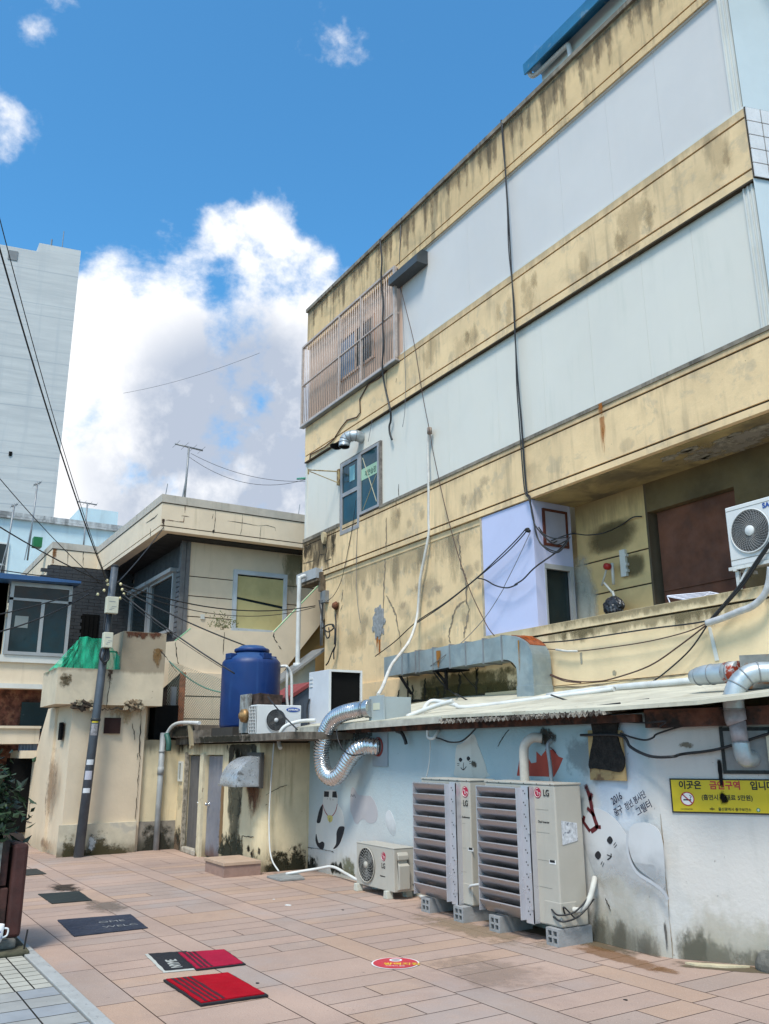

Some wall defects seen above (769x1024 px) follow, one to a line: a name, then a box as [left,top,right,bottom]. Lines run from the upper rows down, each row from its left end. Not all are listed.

spalling [372,604,386,640]
spalling [70,699,93,712]
spalling [123,699,145,713]
leakage [45,763,57,808]
leakage [62,825,181,857]
leakage [218,787,355,877]